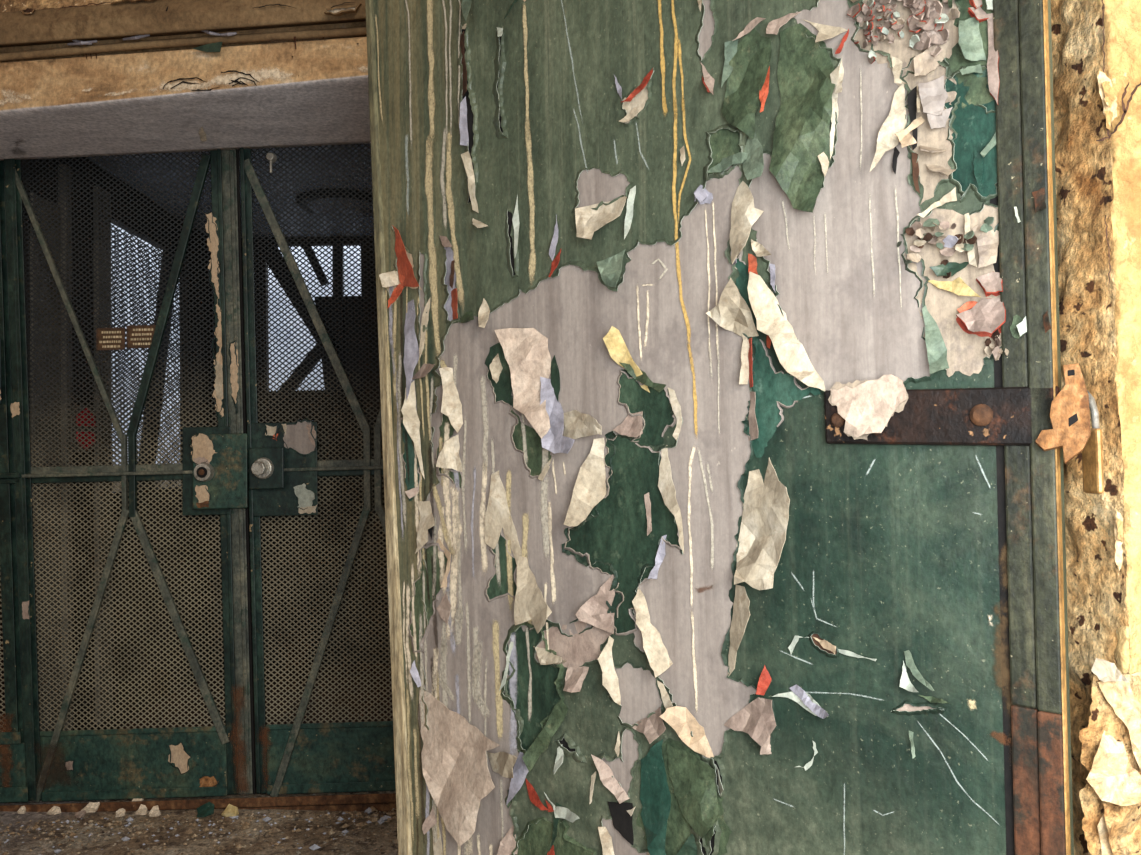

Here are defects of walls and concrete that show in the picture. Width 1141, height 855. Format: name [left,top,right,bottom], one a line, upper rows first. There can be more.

peeling [192,41,223,52]
peeling [1032,187,1047,212]
peeling [1043,311,1051,333]
peeling [190,433,216,465]
peeling [264,418,319,456]
peeling [379,0,1027,855]
peeling [195,484,211,508]
peeling [293,483,317,514]
peeling [168,742,218,787]
peeling [1079,658,1141,855]
peeling [197,802,239,818]